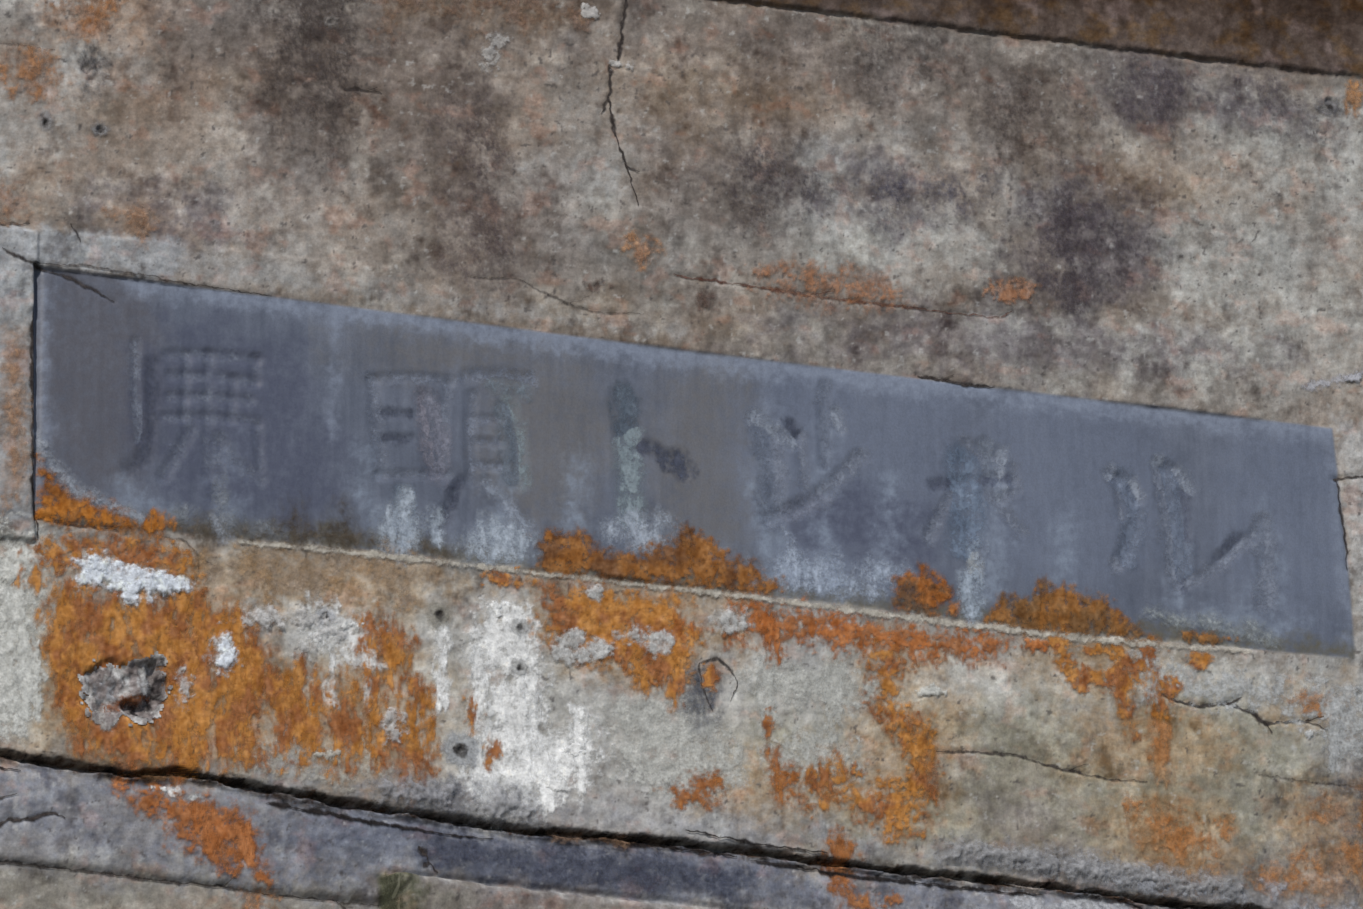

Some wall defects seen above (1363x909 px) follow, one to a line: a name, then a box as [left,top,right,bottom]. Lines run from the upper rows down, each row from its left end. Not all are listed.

crack [601,0,640,206]
crack [29,312,119,538]
spalling [78,651,196,730]
corrosion [2,349,441,909]
peeling [241,604,348,655]
water stain [229,740,392,791]
peeling [381,707,408,745]
corrosion [463,696,478,732]
crack [0,747,1261,909]
water stain [454,597,894,820]
water stain [173,488,1363,772]
corrosion [481,524,1238,909]